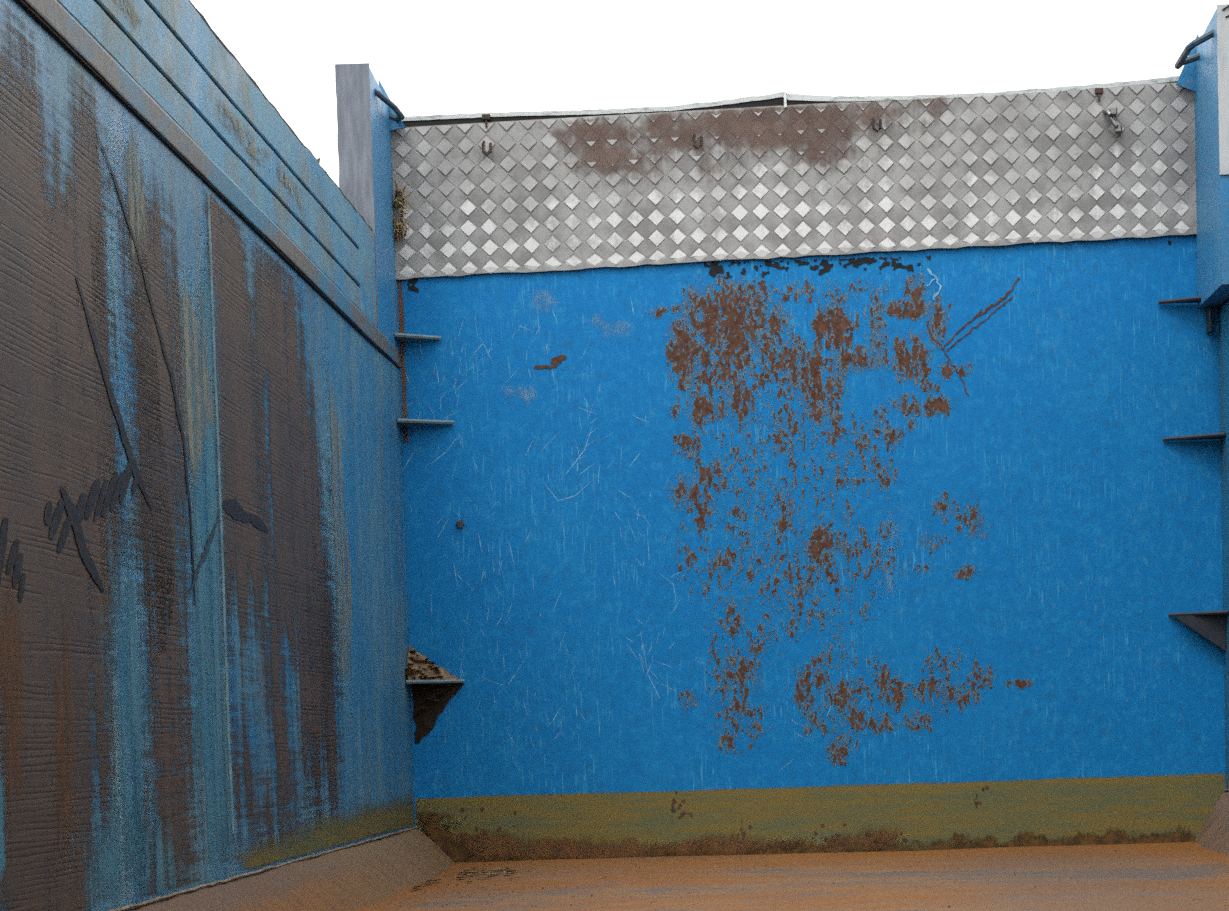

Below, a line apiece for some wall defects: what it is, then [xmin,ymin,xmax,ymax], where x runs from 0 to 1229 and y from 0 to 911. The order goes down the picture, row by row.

rust [556,103,887,172]
damp [243,774,1229,868]